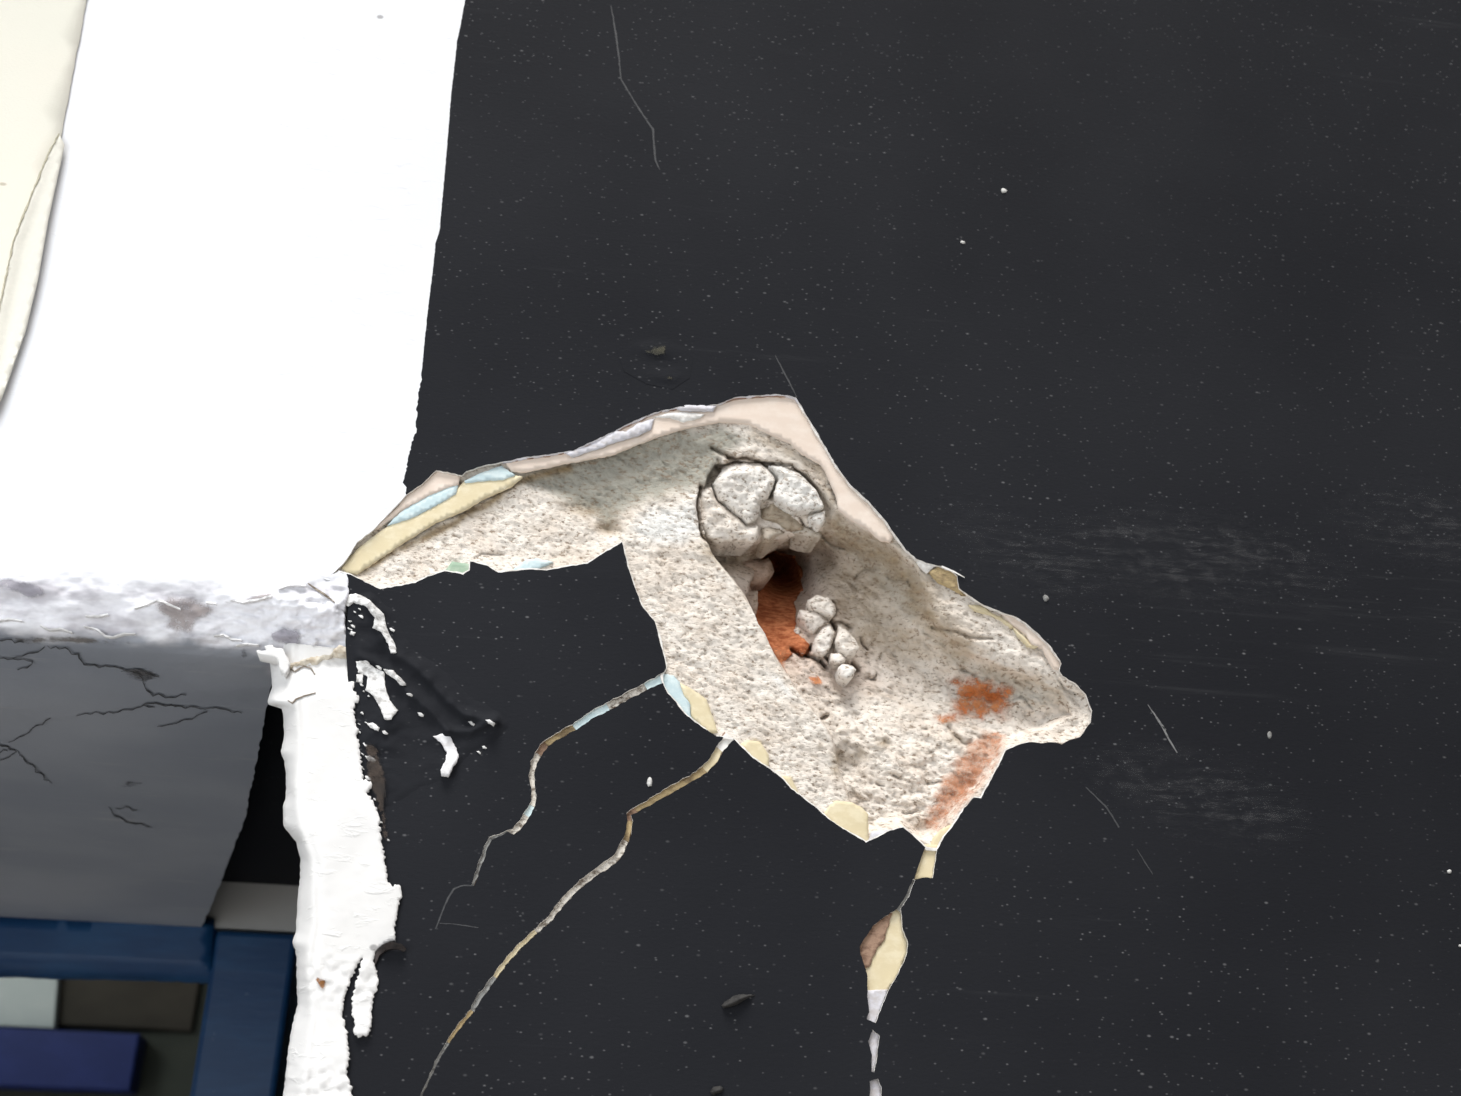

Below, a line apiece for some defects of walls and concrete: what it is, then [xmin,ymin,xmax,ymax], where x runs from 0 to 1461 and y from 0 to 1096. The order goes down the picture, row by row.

water stain [0,580,43,597]
peeling [0,613,136,639]
peeling [134,599,181,610]
water stain [158,599,209,630]
water stain [272,628,299,644]
spalling [206,394,1091,851]
crack [0,639,241,784]
rust [939,678,1012,723]
crack [109,782,149,827]
crack [435,674,668,929]
rust [926,733,1001,828]
crack [421,732,733,1096]